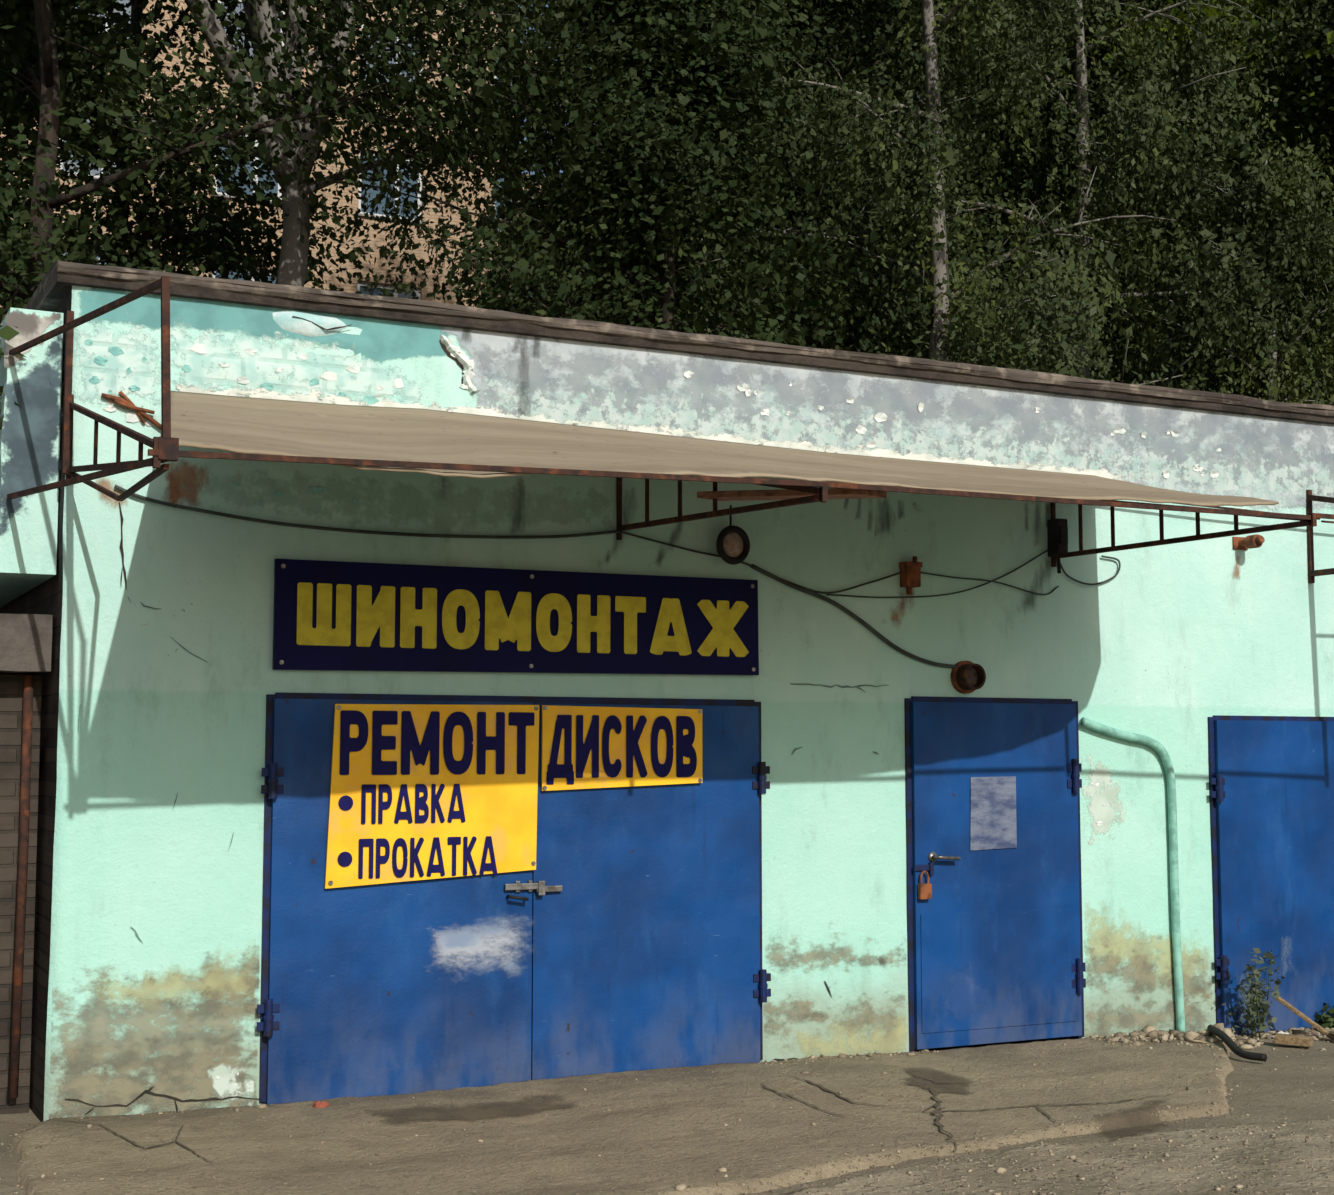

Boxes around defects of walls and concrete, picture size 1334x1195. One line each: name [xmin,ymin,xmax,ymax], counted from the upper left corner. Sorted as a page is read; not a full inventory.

water stain [0,309,63,535]
peeling [73,288,1334,513]
rust [167,463,204,503]
crack [119,502,207,662]
peeling [1082,755,1125,844]
water stain [768,945,900,967]
water stain [1086,919,1212,1037]
water stain [50,957,260,1118]
water stain [764,997,907,1056]
crack [60,1086,259,1162]
peeling [207,1064,254,1106]